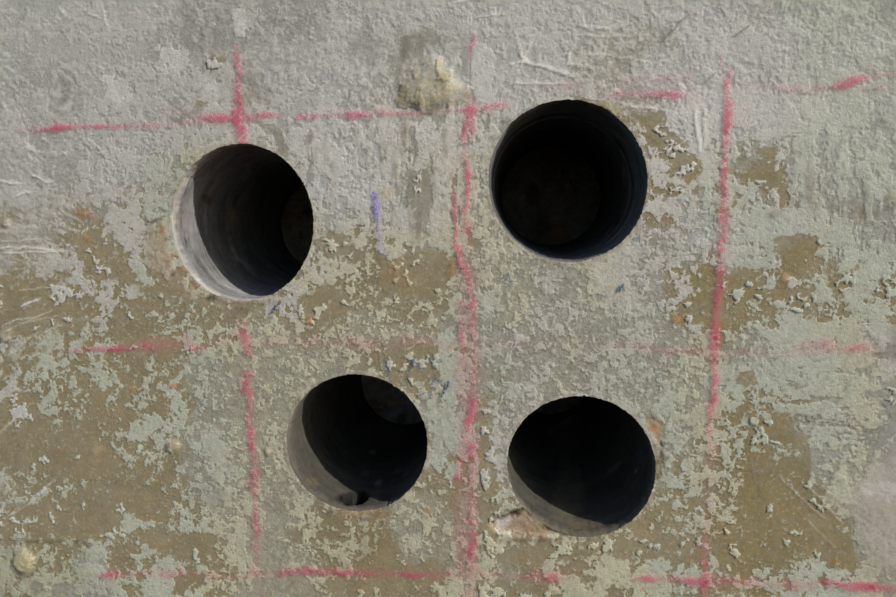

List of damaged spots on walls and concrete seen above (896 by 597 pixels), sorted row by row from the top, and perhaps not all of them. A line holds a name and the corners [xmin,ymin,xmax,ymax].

peeling [486,96,703,265]
peeling [735,146,783,191]
peeling [771,232,823,267]
peeling [0,272,93,337]
peeling [675,260,868,330]
peeling [872,271,896,304]
peeling [736,370,759,389]
peeling [283,342,440,523]
peeling [845,381,896,449]
peeling [0,391,227,572]
peeling [474,396,863,597]
peeling [323,576,378,597]